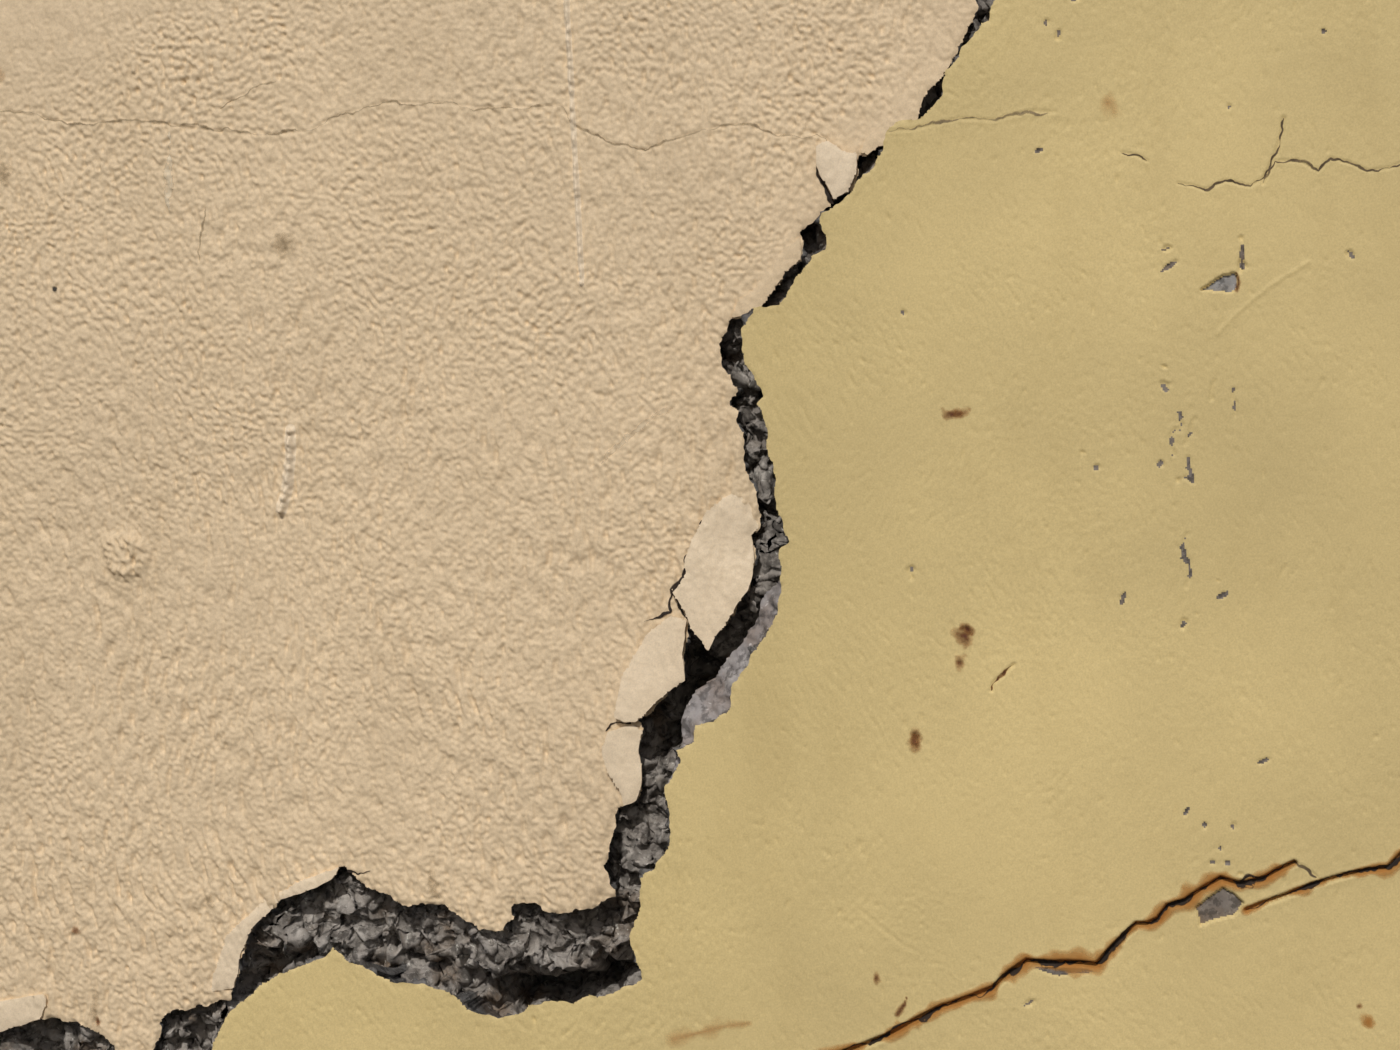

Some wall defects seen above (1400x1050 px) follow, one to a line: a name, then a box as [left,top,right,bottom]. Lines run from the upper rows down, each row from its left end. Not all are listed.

crack [1178,118,1400,191]
crack [153,0,1047,1050]
crack [0,994,115,1050]
crack [843,856,1400,1050]